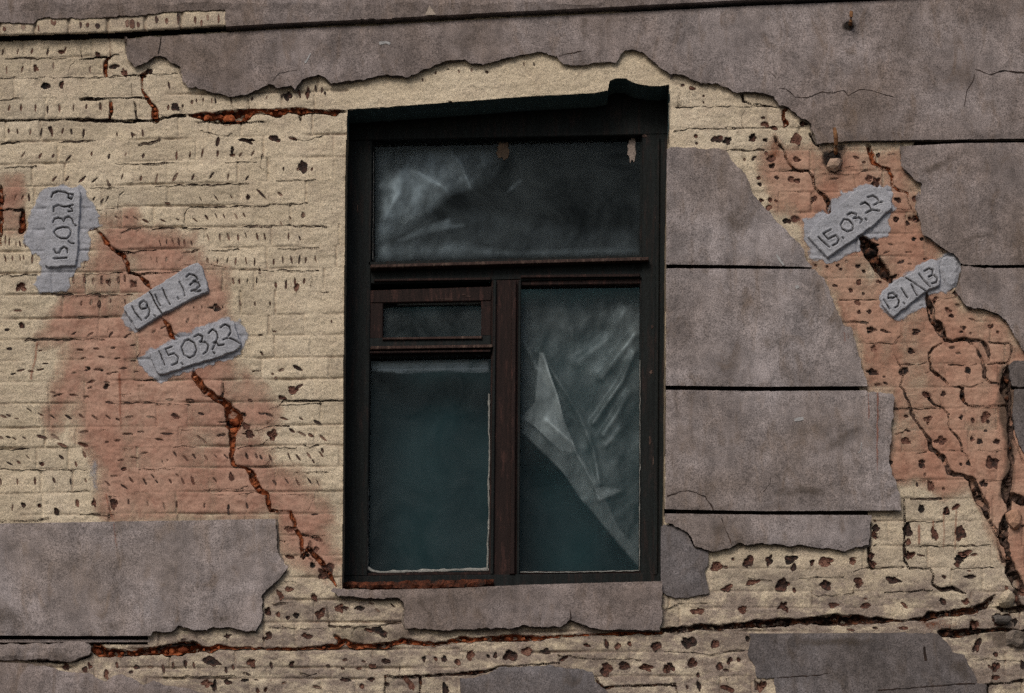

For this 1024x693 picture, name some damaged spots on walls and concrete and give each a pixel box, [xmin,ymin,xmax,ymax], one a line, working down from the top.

crack [0,33,345,342]
peeling [866,171,888,188]
spalling [893,169,922,227]
spalling [848,238,912,314]
spalling [911,235,957,260]
spalling [931,272,1024,368]
spalling [84,332,139,389]
spalling [852,305,933,445]
spalling [959,409,1000,444]
crack [0,448,119,517]
crack [31,236,1024,693]
peeling [985,456,1000,469]